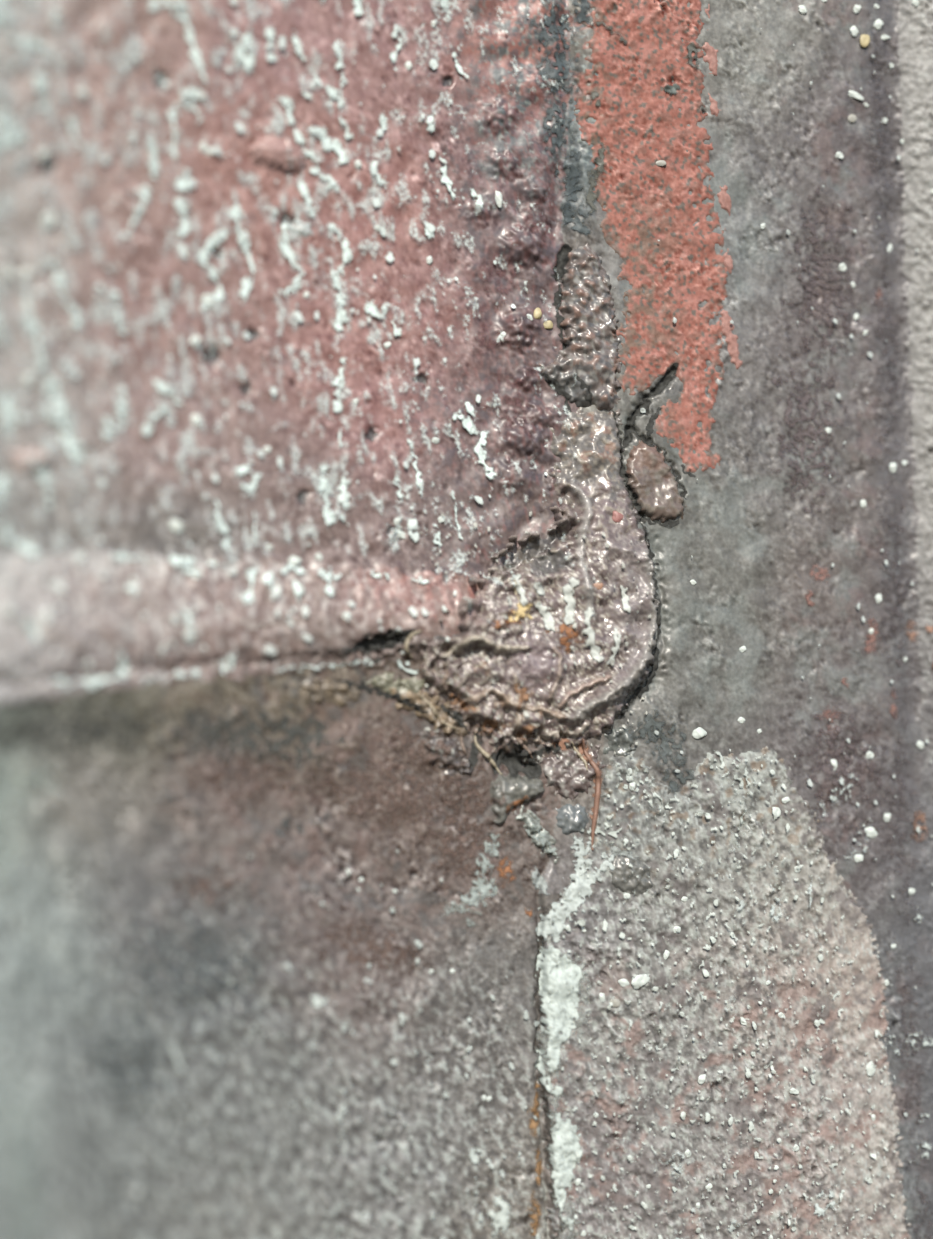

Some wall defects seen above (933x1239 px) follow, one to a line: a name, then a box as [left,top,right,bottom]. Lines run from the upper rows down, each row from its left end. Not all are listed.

damp [122,0,207,238]
damp [278,40,353,218]
damp [439,154,455,197]
damp [198,203,255,311]
damp [328,223,352,331]
damp [364,300,401,336]
peeling [572,0,743,523]
damp [319,464,350,525]
damp [453,402,497,479]
damp [444,833,500,926]
crack [533,908,565,1239]
damp [532,822,633,1239]